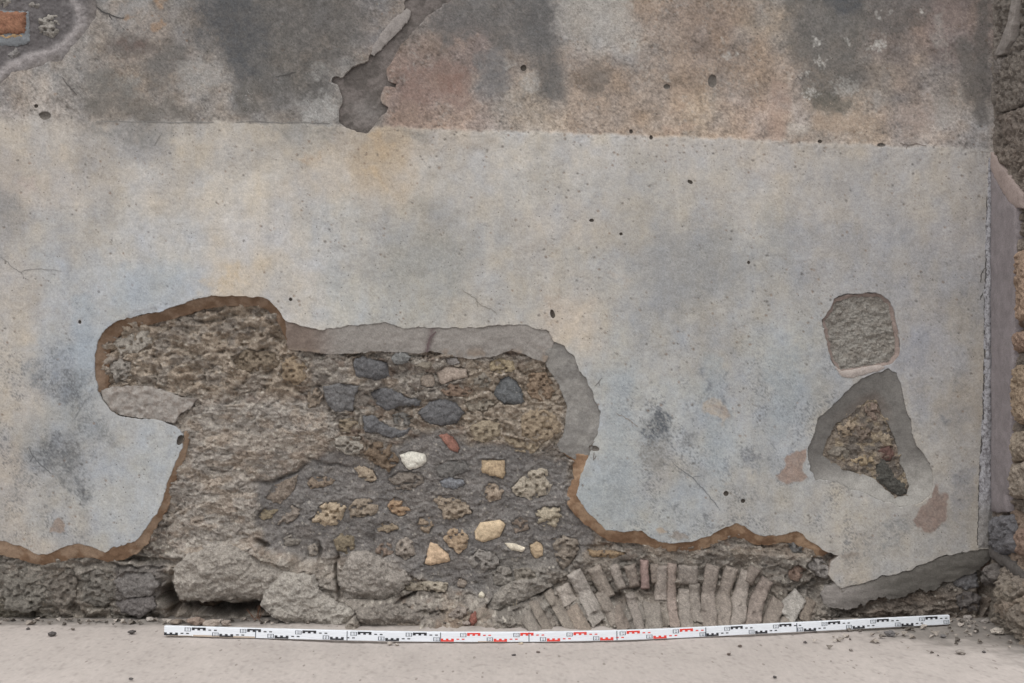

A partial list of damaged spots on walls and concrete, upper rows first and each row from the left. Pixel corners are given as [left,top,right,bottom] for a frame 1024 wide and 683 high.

water stain [76,0,377,153]
spalling [332,0,451,134]
water stain [422,0,644,113]
spalling [0,292,992,631]